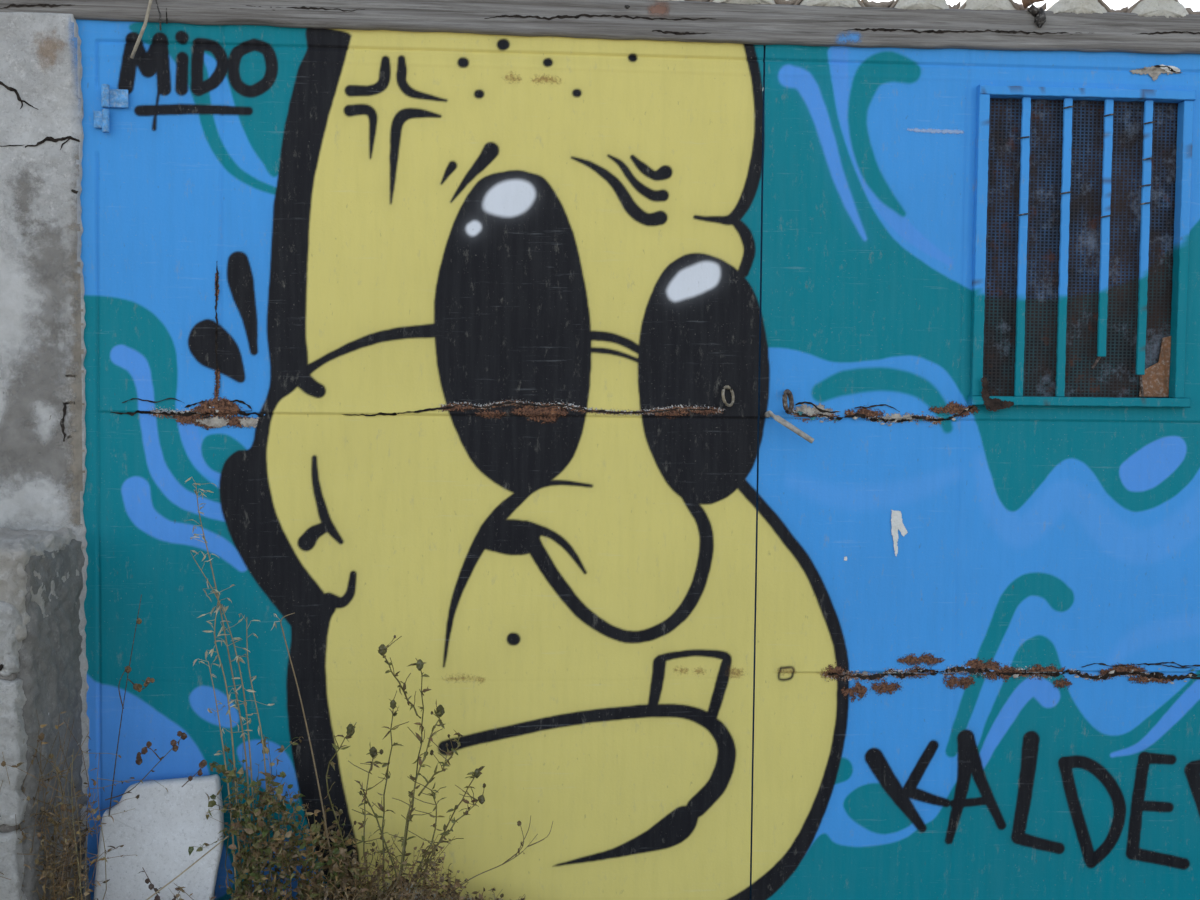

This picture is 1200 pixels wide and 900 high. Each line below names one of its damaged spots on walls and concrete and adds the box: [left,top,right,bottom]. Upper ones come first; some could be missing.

crack [0,81,80,150]
corrosion [151,397,259,430]
corrosion [981,377,1014,412]
peeling [891,510,908,556]